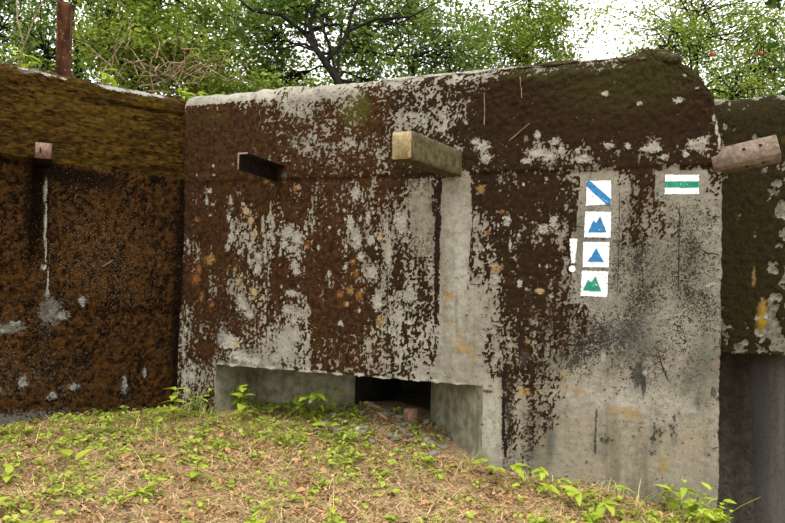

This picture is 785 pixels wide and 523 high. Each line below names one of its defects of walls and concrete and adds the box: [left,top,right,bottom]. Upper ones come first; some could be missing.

peeling [377,66,520,82]
peeling [471,138,492,164]
peeling [520,130,592,165]
peeling [603,140,669,161]
peeling [681,114,721,158]
efflorescence [40,178,49,288]
peeling [328,185,433,316]
peeling [532,215,559,235]
spalling [216,195,342,375]
peeling [181,300,201,405]
spalling [376,375,440,383]